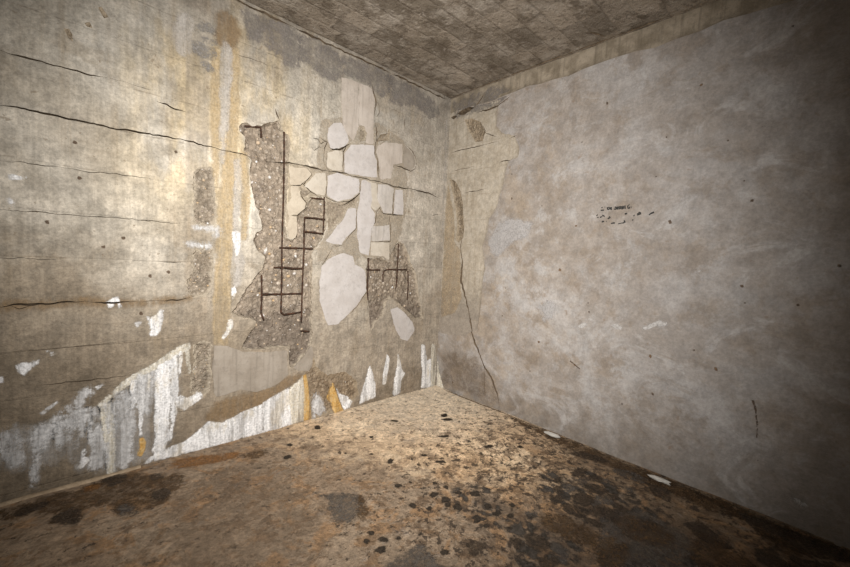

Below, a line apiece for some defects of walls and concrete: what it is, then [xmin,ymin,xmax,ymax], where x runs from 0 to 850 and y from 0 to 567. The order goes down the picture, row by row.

crack [3,296,193,309]
damp [0,343,405,525]
corrosion [211,19,250,310]
peeling [212,77,423,419]
crack [0,0,710,262]
damp [364,531,401,554]
damp [421,344,443,388]
crack [446,240,850,551]